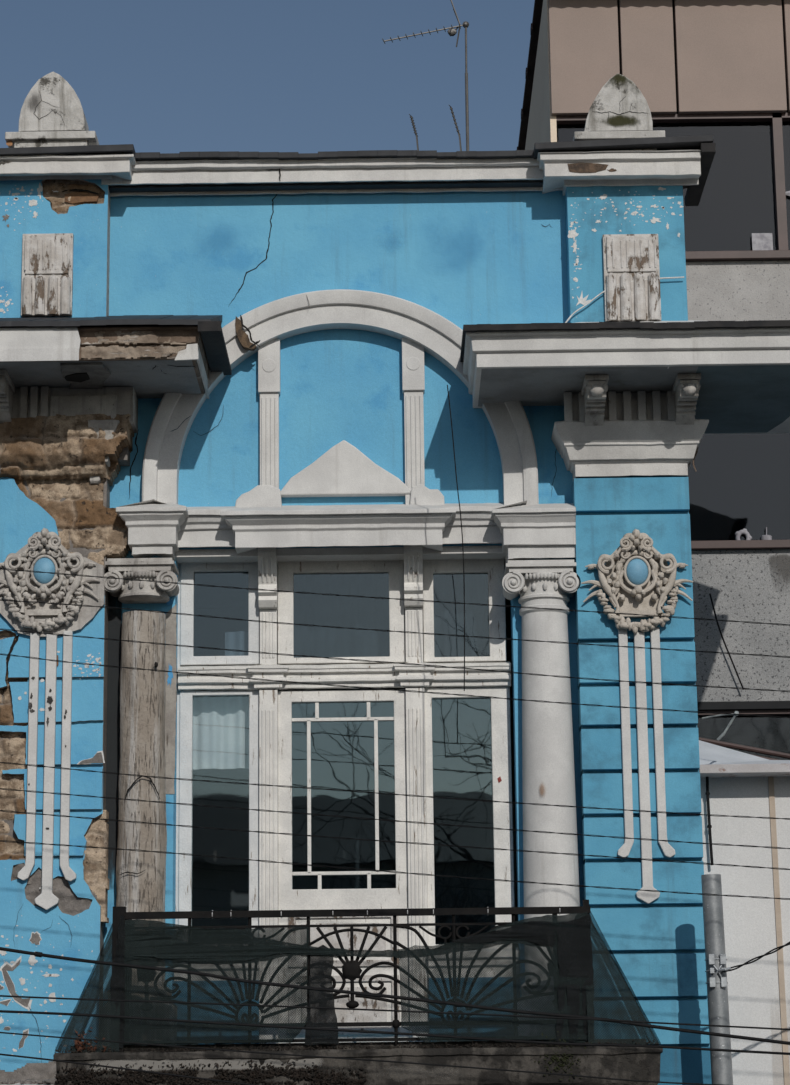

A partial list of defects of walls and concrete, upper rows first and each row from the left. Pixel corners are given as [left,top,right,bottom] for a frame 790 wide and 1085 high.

flaking render [1,179,105,231]
crack [228,169,281,307]
peeling [568,187,684,318]
flaking render [0,414,134,566]
crack [5,635,19,685]
peeling [73,653,101,677]
flaking render [0,668,109,924]
spalling [0,915,74,1081]